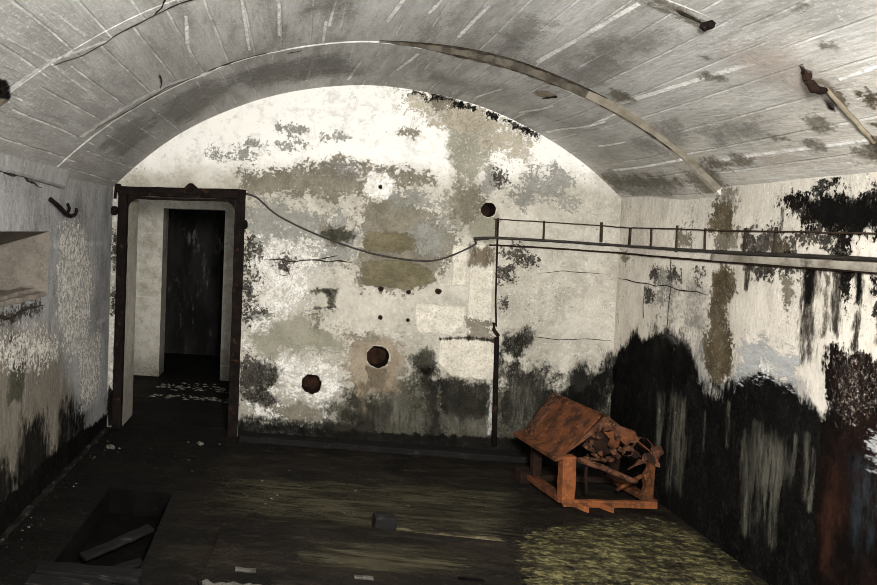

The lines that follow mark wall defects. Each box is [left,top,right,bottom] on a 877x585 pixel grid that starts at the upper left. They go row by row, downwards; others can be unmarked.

leakage [468,213,501,268]
leakage [713,177,877,364]
leakage [238,278,830,585]